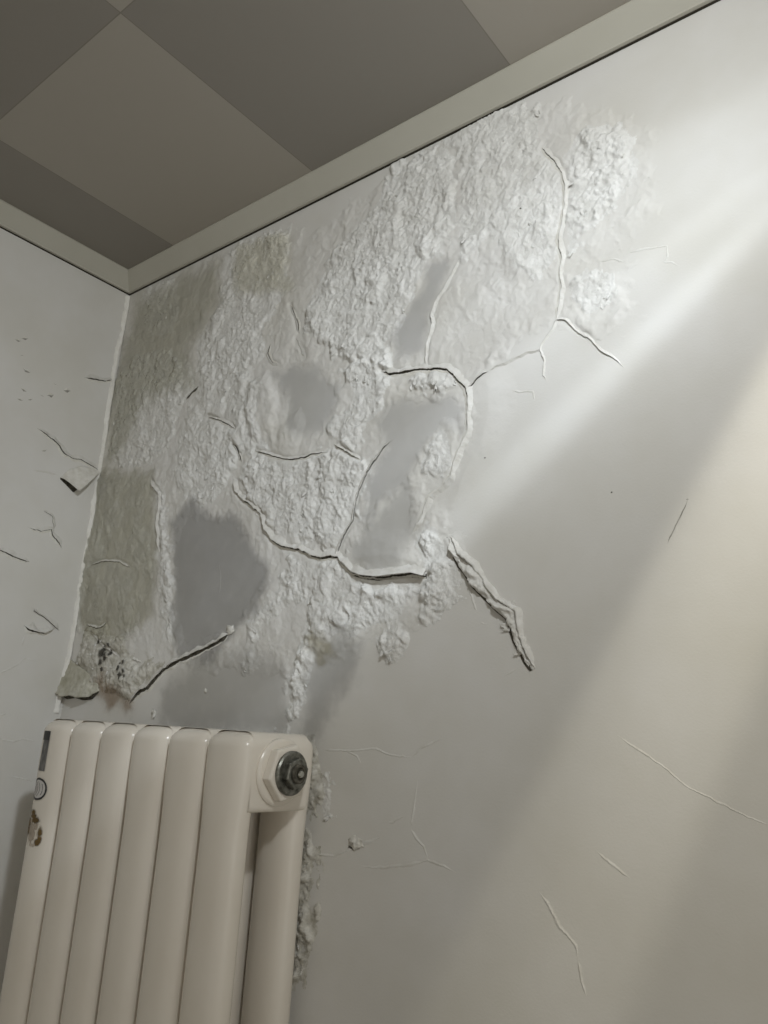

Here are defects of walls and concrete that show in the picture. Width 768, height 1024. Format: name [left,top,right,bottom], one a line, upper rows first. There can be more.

crack [37,428,98,470]
crack [84,374,112,383]
crack [266,344,278,366]
crack [291,306,304,356]
peeling [55,101,562,733]
crack [382,145,624,534]
crack [0,510,62,563]
crack [209,416,427,585]
crack [24,609,59,636]
crack [619,736,768,825]
spalling [292,734,326,991]
crack [539,892,587,997]